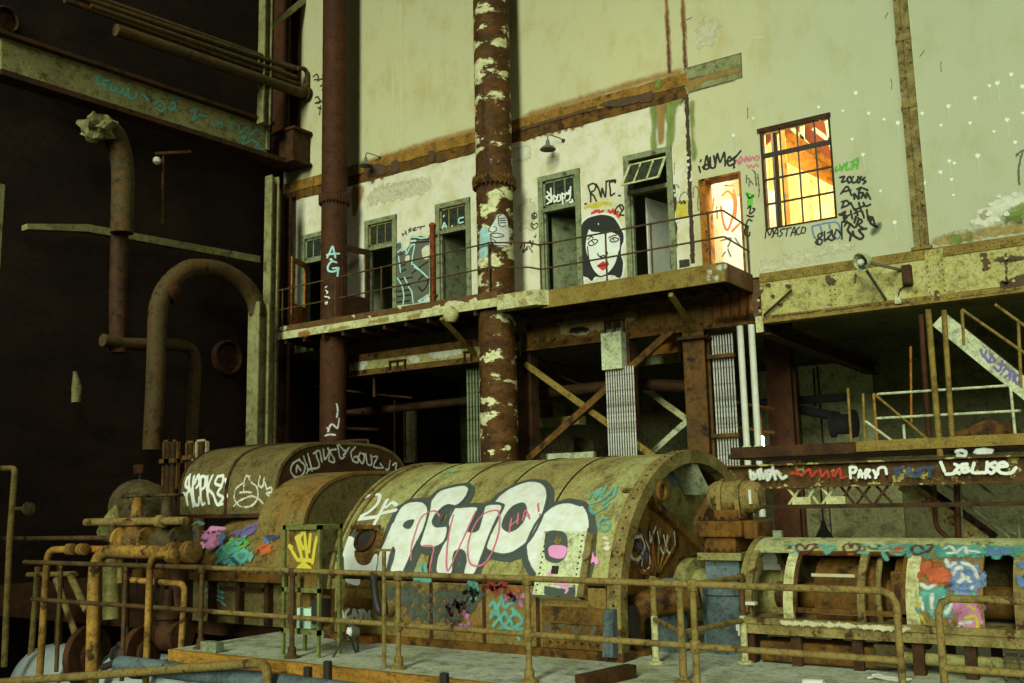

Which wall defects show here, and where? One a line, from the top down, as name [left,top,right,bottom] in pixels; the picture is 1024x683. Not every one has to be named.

rust [516,0,687,139]
leakage [650,68,739,149]
peeling [367,176,432,206]
rust [364,129,475,183]